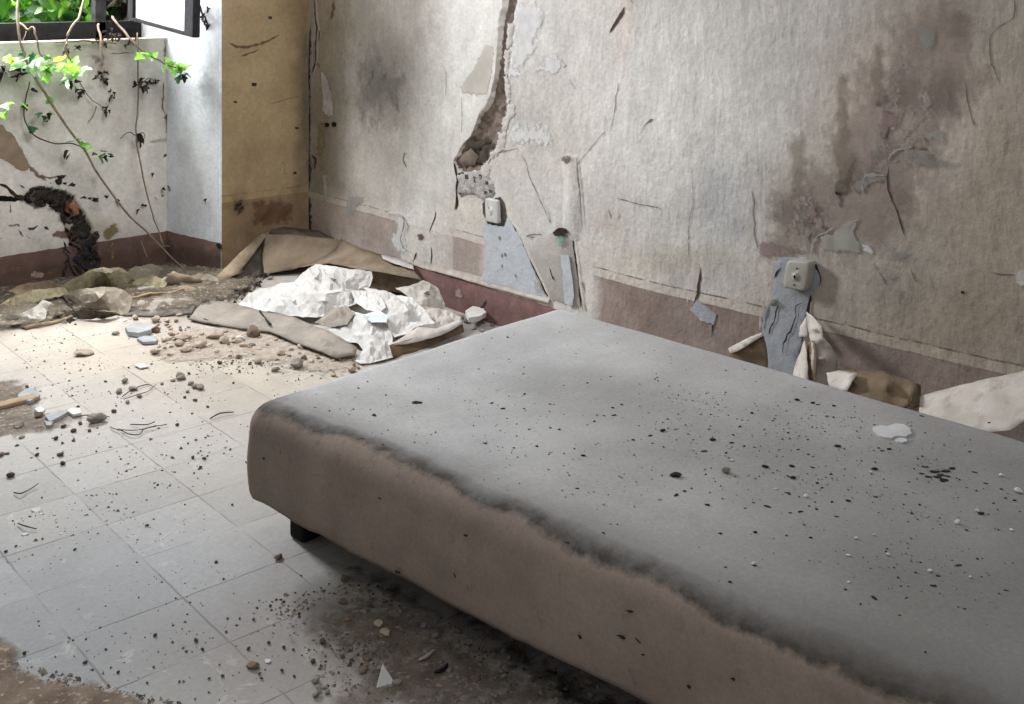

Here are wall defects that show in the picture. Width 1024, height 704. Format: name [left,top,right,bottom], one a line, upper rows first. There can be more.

crack [609,1,632,33]
crack [989,0,1016,83]
flaking render [0,125,31,171]
flaking render [451,0,581,307]
flaking render [0,175,108,276]
crack [887,169,905,236]
flaking render [687,299,717,325]
flaking render [759,218,873,375]